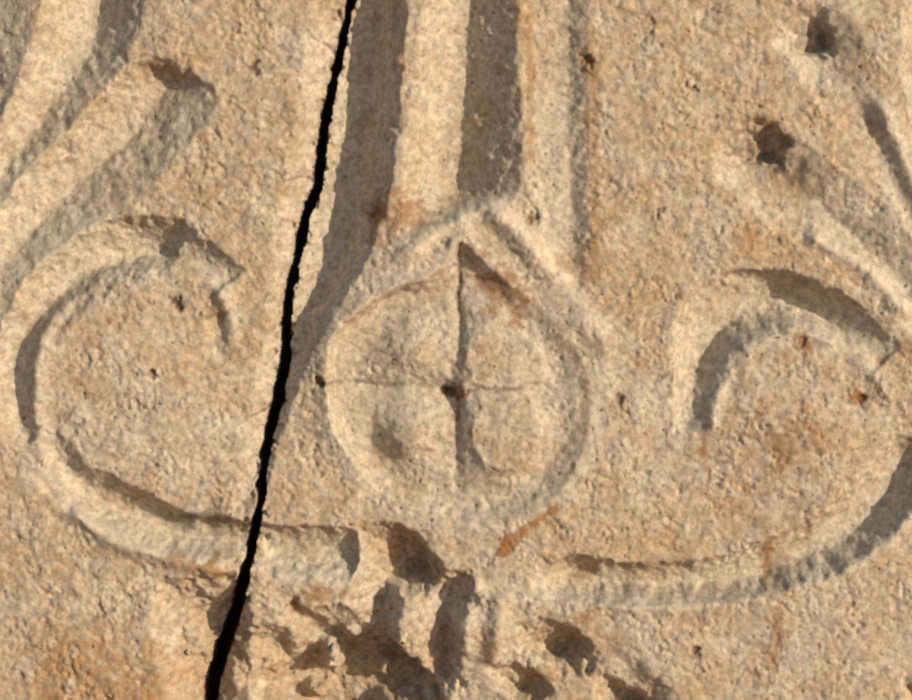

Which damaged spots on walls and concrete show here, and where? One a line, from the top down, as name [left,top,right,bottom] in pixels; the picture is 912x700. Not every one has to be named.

crack [203,0,358,700]
spalling [153,572,237,700]
spalling [238,521,472,700]
spalling [489,618,583,691]
spalling [595,673,646,700]